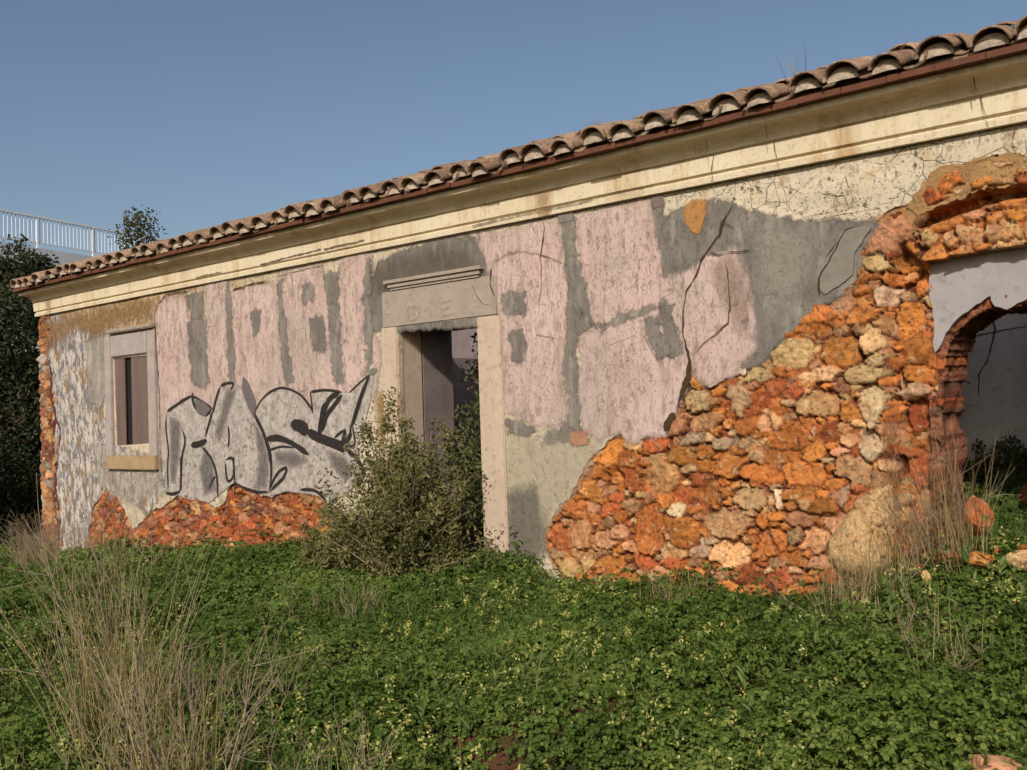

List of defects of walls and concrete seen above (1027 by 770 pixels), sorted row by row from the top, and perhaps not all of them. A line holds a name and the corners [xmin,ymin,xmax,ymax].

crack [936,77,990,165]
flaking render [683,199,707,234]
crack [663,125,801,431]
crack [817,172,876,294]
peeling [36,313,336,553]